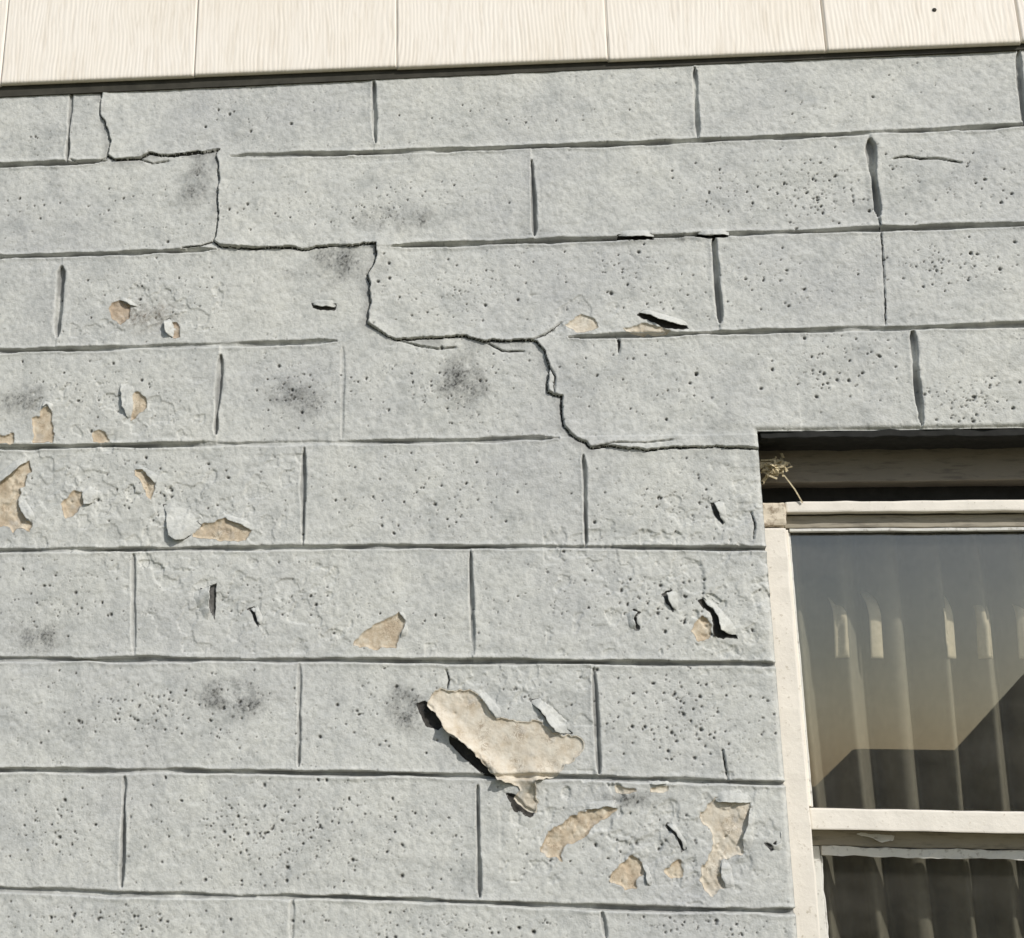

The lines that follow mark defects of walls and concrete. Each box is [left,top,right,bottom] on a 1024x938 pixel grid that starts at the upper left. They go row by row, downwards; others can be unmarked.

crack [73,112,756,452]
peeling [163,318,180,338]
peeling [623,309,689,337]
peeling [120,383,147,421]
peeling [0,401,54,533]
peeling [135,463,157,499]
peeling [163,503,251,542]
peeling [353,612,408,650]
peeling [691,594,738,642]
peeling [416,688,584,818]
peeling [540,785,637,862]
peeling [699,790,755,897]